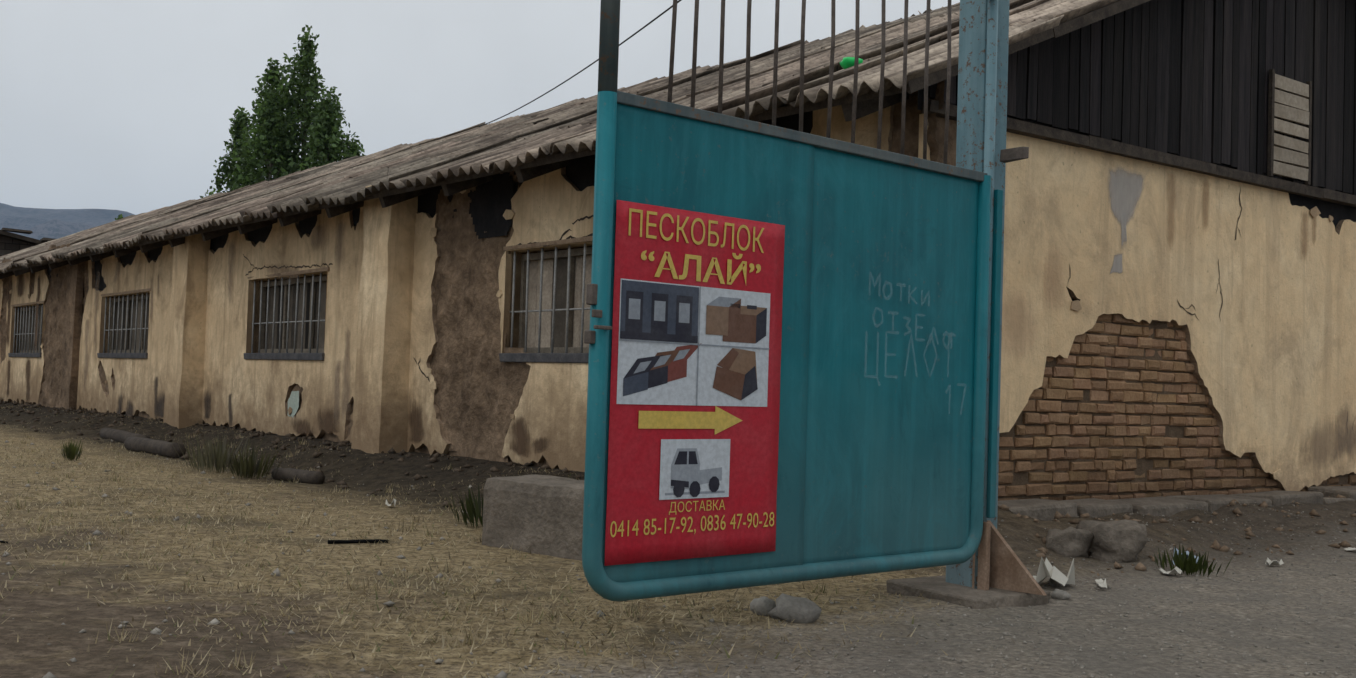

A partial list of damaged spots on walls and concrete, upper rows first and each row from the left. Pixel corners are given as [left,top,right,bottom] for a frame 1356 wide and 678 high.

spalling [561,155,595,191]
spalling [209,224,273,254]
spalling [295,215,317,238]
spalling [349,208,360,230]
peeling [1109,169,1143,273]
spalling [1289,193,1356,234]
spalling [0,258,14,363]
spalling [28,264,68,407]
spalling [417,171,531,462]
spalling [1066,264,1082,311]
flaking render [285,383,303,418]
spalling [998,313,1356,501]